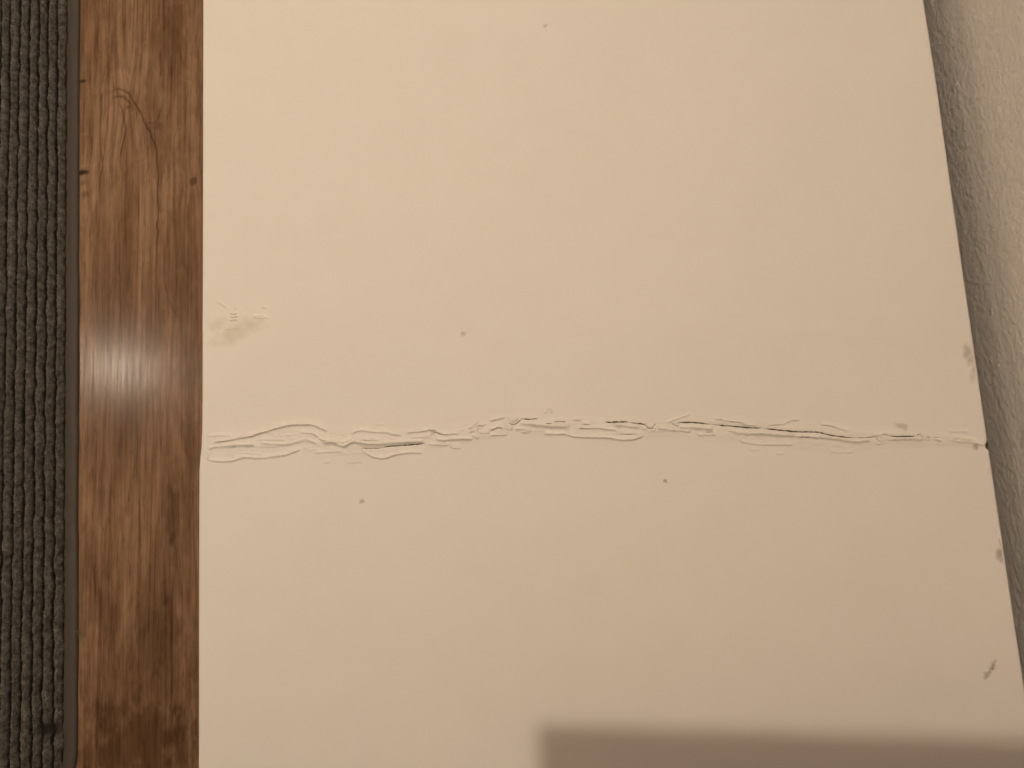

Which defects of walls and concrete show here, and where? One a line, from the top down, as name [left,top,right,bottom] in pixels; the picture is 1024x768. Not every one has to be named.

crack [204,406,985,465]